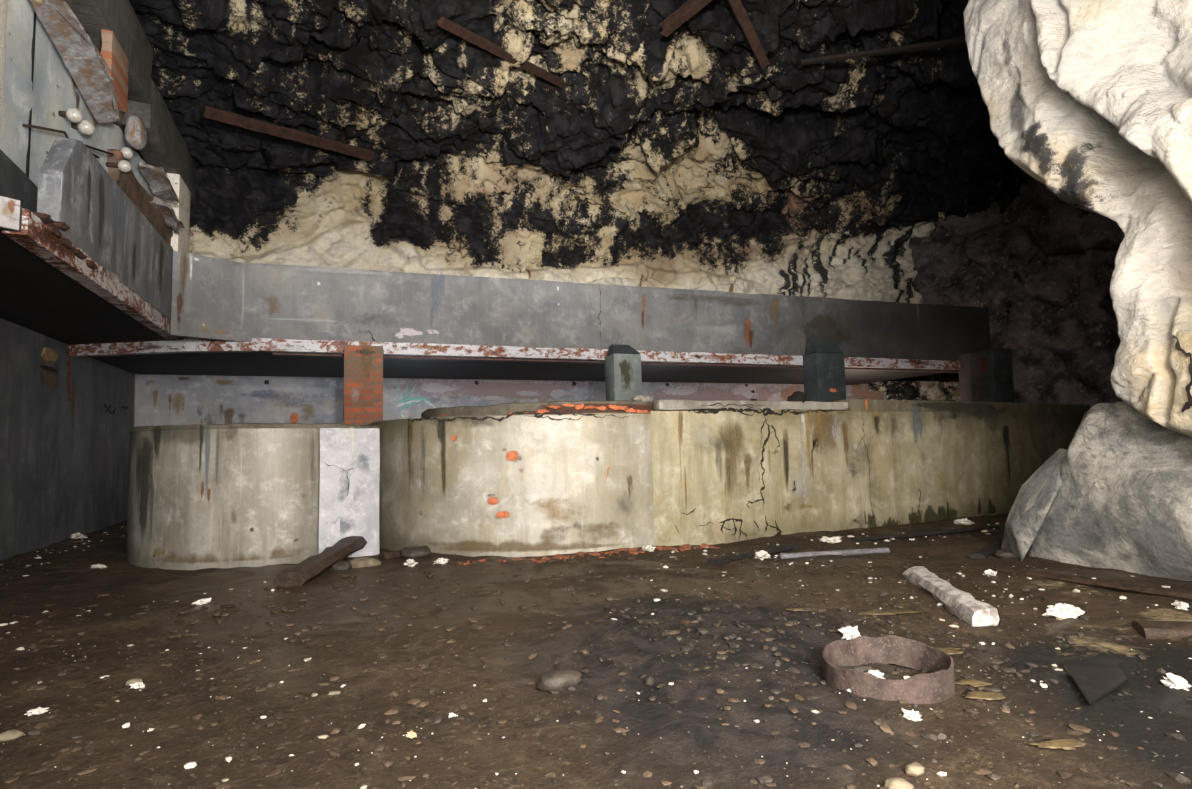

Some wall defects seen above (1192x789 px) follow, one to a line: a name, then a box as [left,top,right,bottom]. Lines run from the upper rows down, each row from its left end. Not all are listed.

peeling [401,379,795,414]
damp [136,426,161,532]
crack [675,403,874,540]